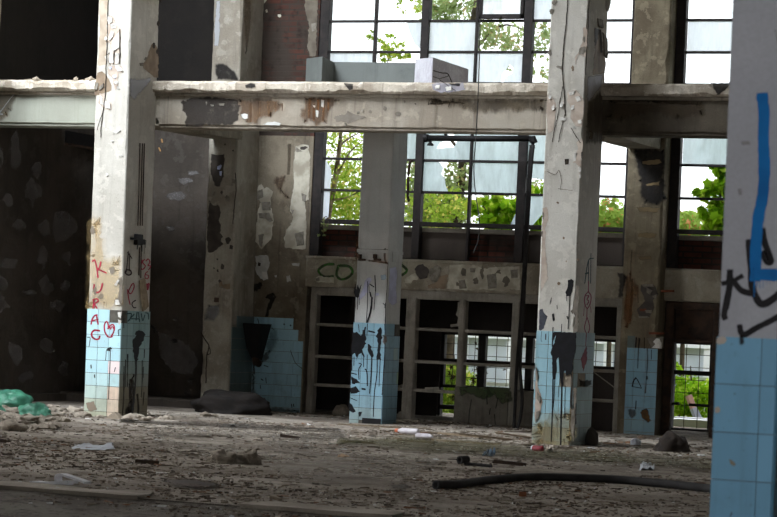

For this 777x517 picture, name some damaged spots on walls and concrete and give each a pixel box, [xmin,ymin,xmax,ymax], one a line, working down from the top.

peeling [94,0,123,110]
flaking render [131,43,159,98]
flaking render [181,97,248,126]